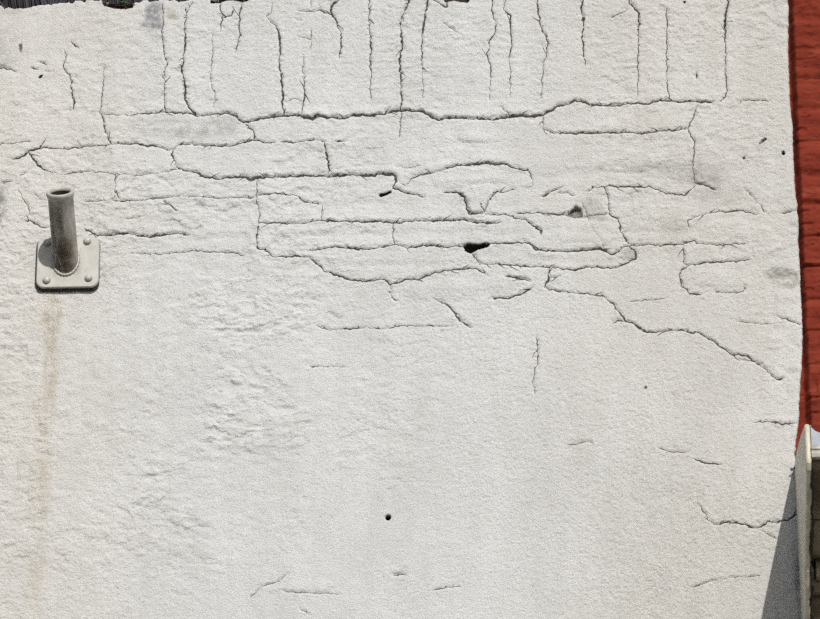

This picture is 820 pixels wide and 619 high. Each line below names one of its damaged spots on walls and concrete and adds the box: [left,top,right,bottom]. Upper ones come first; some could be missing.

crack [0,0,791,380]
crack [697,500,797,538]